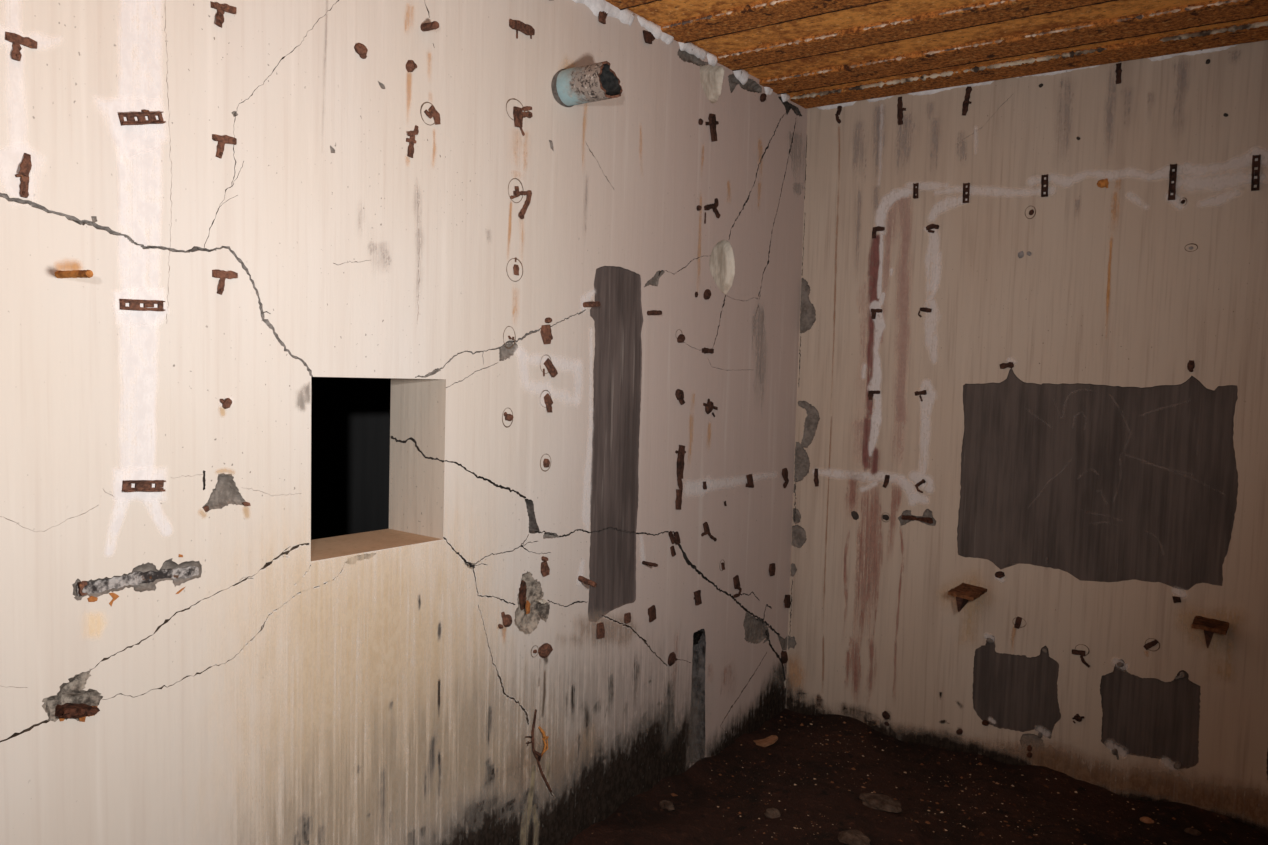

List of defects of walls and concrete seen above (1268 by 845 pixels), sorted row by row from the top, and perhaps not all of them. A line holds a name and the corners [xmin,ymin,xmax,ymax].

corrosion [56,262,81,271]
damp [98,0,172,556]
crack [0,0,339,377]
damp [856,149,1268,453]
spalling [202,470,251,512]
crack [0,718,54,742]
spalling [42,669,103,722]
spalling [72,554,202,607]
crack [91,543,345,700]
spalling [514,571,550,634]
crack [391,436,793,729]
damp [408,665,1032,845]